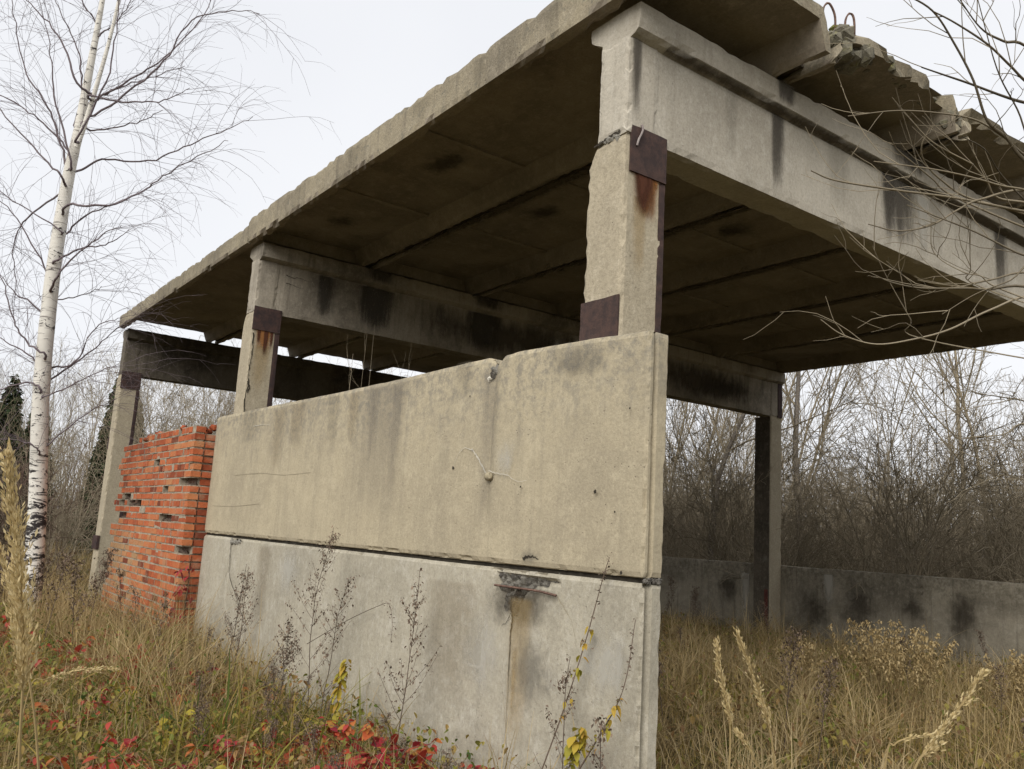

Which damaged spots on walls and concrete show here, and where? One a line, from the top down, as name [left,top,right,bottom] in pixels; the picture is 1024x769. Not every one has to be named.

spalling [828,24,907,90]
leakage [779,80,794,104]
leakage [773,114,783,176]
rust [636,174,658,213]
leakage [884,173,927,245]
leakage [319,276,335,311]
leakage [361,268,393,325]
rust [257,330,273,352]
spalling [494,555,560,619]